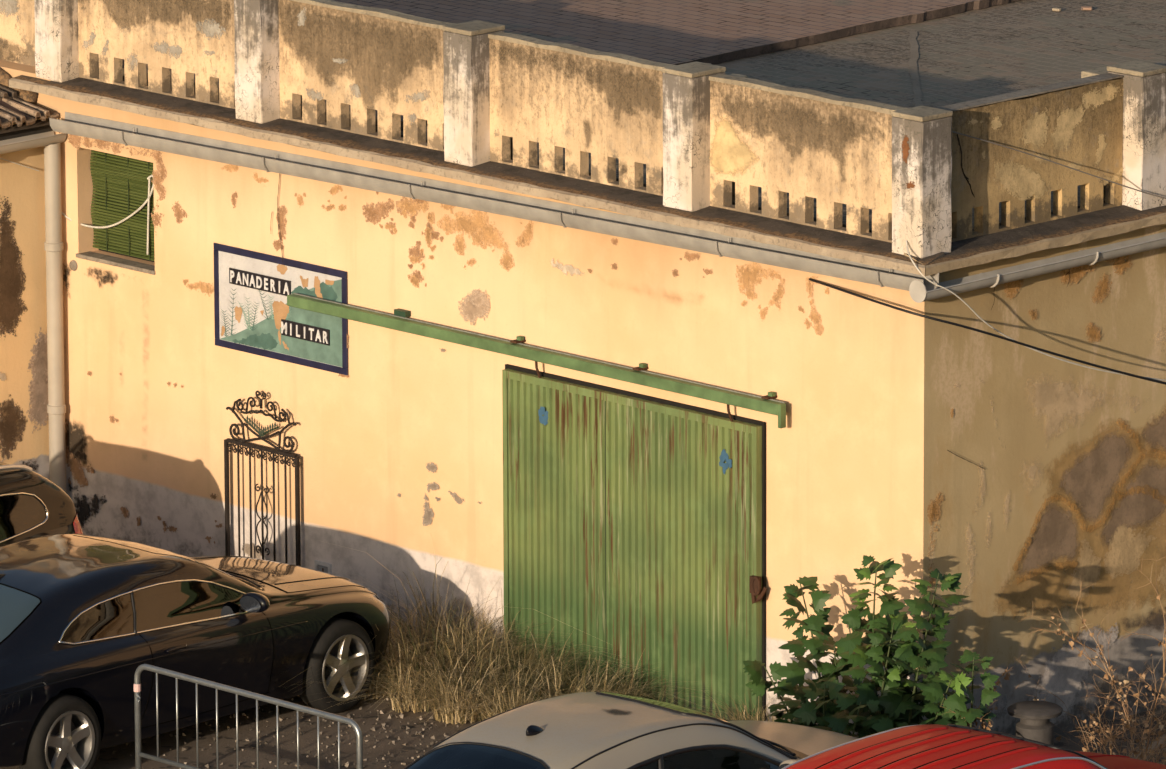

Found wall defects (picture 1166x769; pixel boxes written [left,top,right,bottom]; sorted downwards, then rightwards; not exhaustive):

peeling [322,185,347,211]
peeling [273,193,306,275]
peeling [362,191,533,288]
spalling [221,306,242,336]
spalling [260,301,289,350]
spalling [300,275,334,299]
spalling [458,289,490,325]
peeling [735,262,785,320]
peeling [798,276,829,336]
spalling [422,462,482,526]
peeling [1066,521,1166,599]